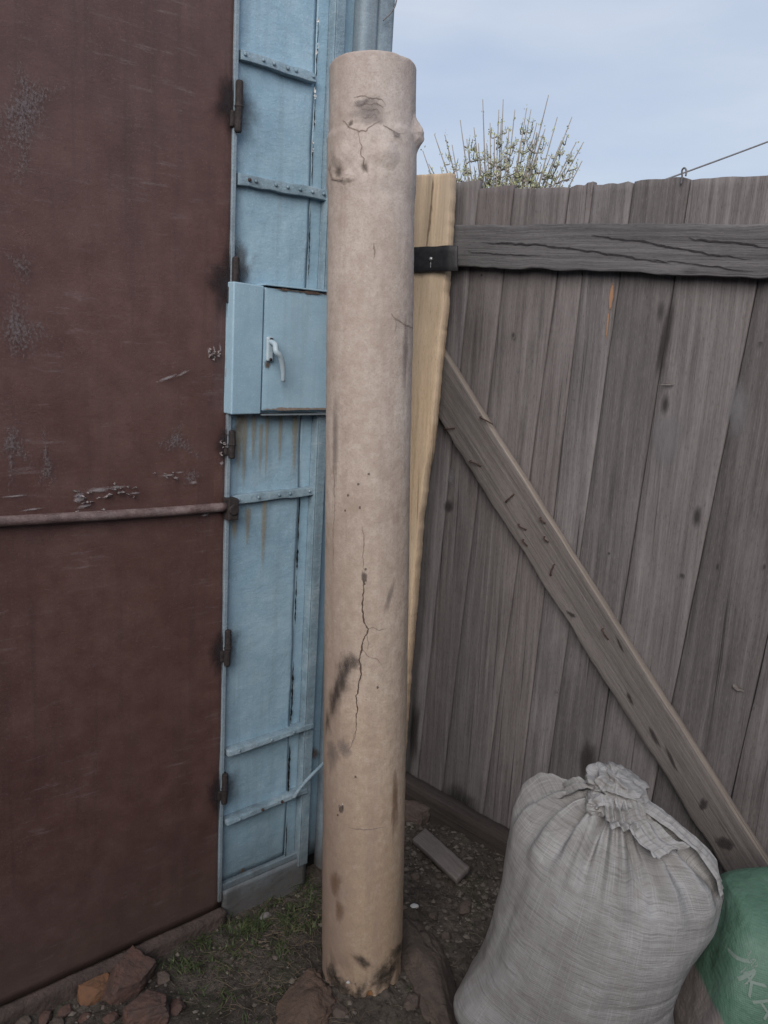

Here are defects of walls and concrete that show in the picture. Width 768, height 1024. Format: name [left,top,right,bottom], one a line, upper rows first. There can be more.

peeling [74,482,137,512]
crack [348,527,382,751]
water stain [328,968,361,1000]